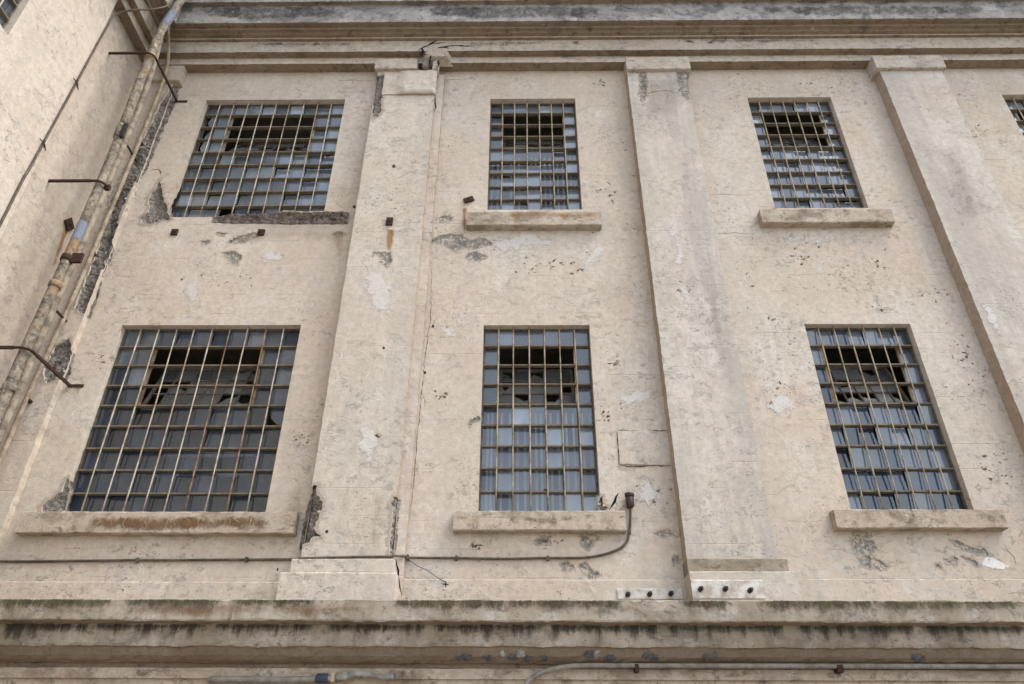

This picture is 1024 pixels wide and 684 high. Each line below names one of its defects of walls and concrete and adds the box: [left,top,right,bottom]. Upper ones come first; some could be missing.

spalling [73,83,182,319]
peeling [432,215,492,262]
spalling [41,337,75,384]
spalling [37,475,73,512]
corrosion [94,517,263,530]
spalling [299,482,326,550]
spalling [386,495,401,555]
damp [468,600,526,608]
damp [6,623,196,636]
damp [330,624,421,634]
damp [552,625,657,636]
damp [801,626,1023,638]